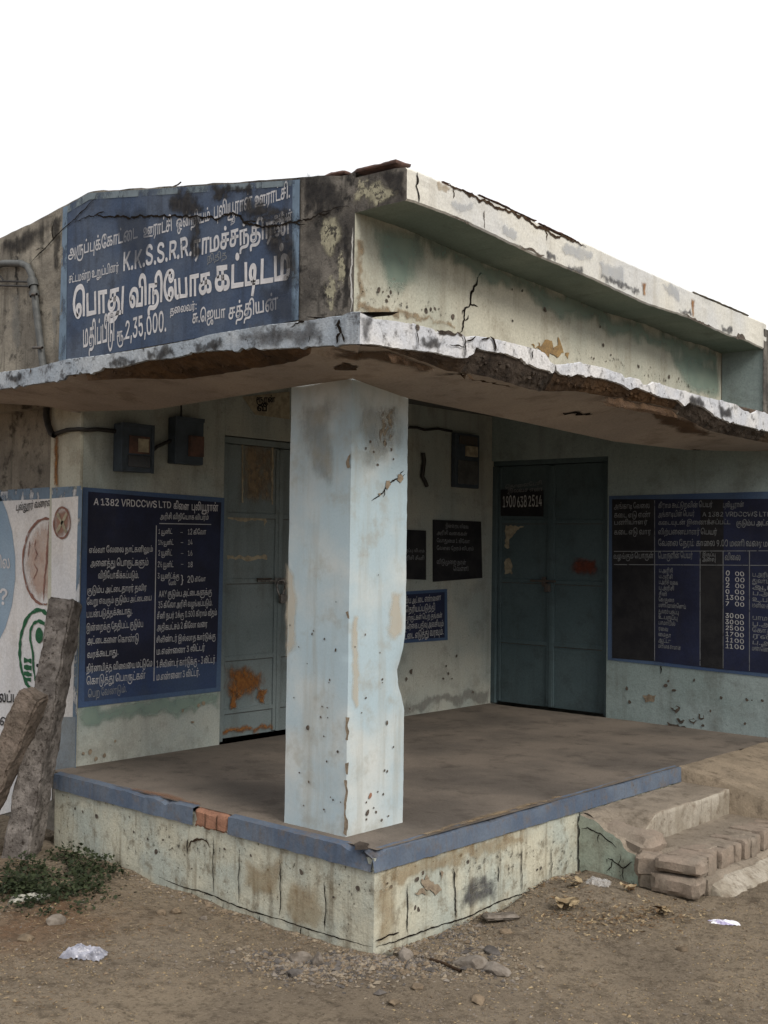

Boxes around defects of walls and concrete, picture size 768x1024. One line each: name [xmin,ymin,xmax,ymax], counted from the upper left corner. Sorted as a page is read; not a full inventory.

crack [30,196,349,264]
crack [416,172,582,246]
spalling [334,363,358,371]
damp [213,177,732,418]
crack [439,273,510,387]
peeling [531,337,569,358]
spalling [461,349,766,441]
flaking render [133,789,232,833]
crack [579,812,631,880]
crack [158,838,527,947]
peeling [414,870,444,912]